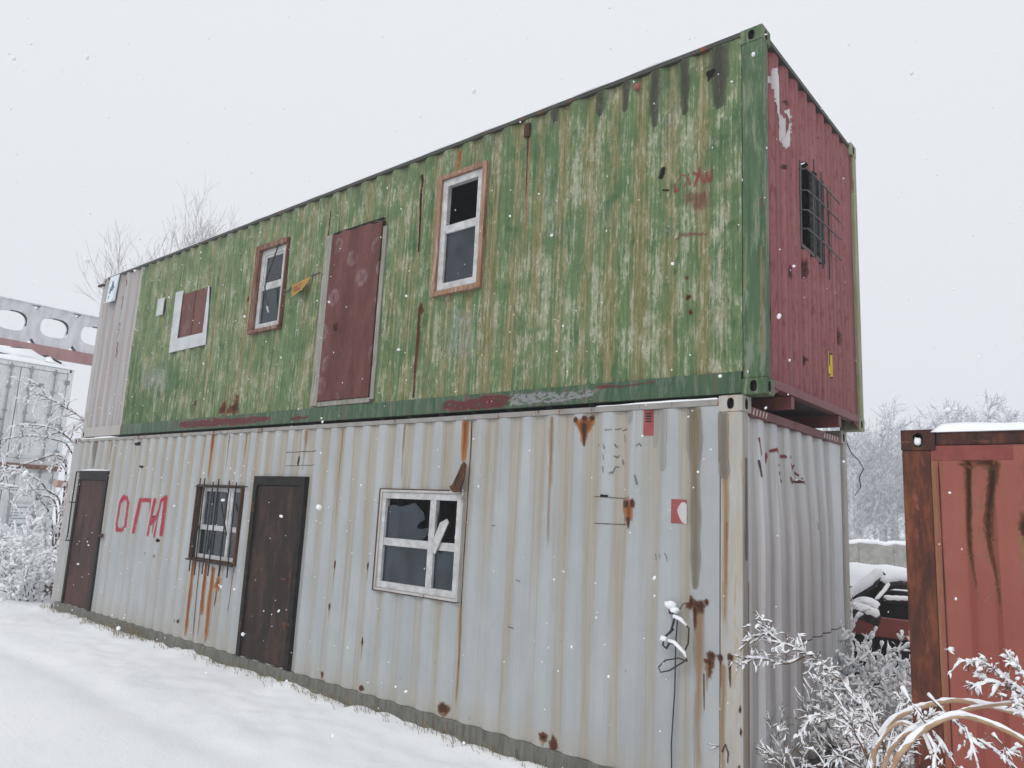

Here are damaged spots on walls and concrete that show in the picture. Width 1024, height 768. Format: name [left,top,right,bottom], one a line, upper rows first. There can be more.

damp [622,80,631,112]
damp [650,69,659,128]
damp [680,58,689,115]
damp [711,44,728,109]
peeling [768,67,792,149]
peeling [440,380,655,412]
rust [573,415,595,445]
rust [623,497,635,528]
rust [959,461,1001,604]
rust [177,561,234,640]
rust [686,596,733,766]
rust [538,732,558,750]